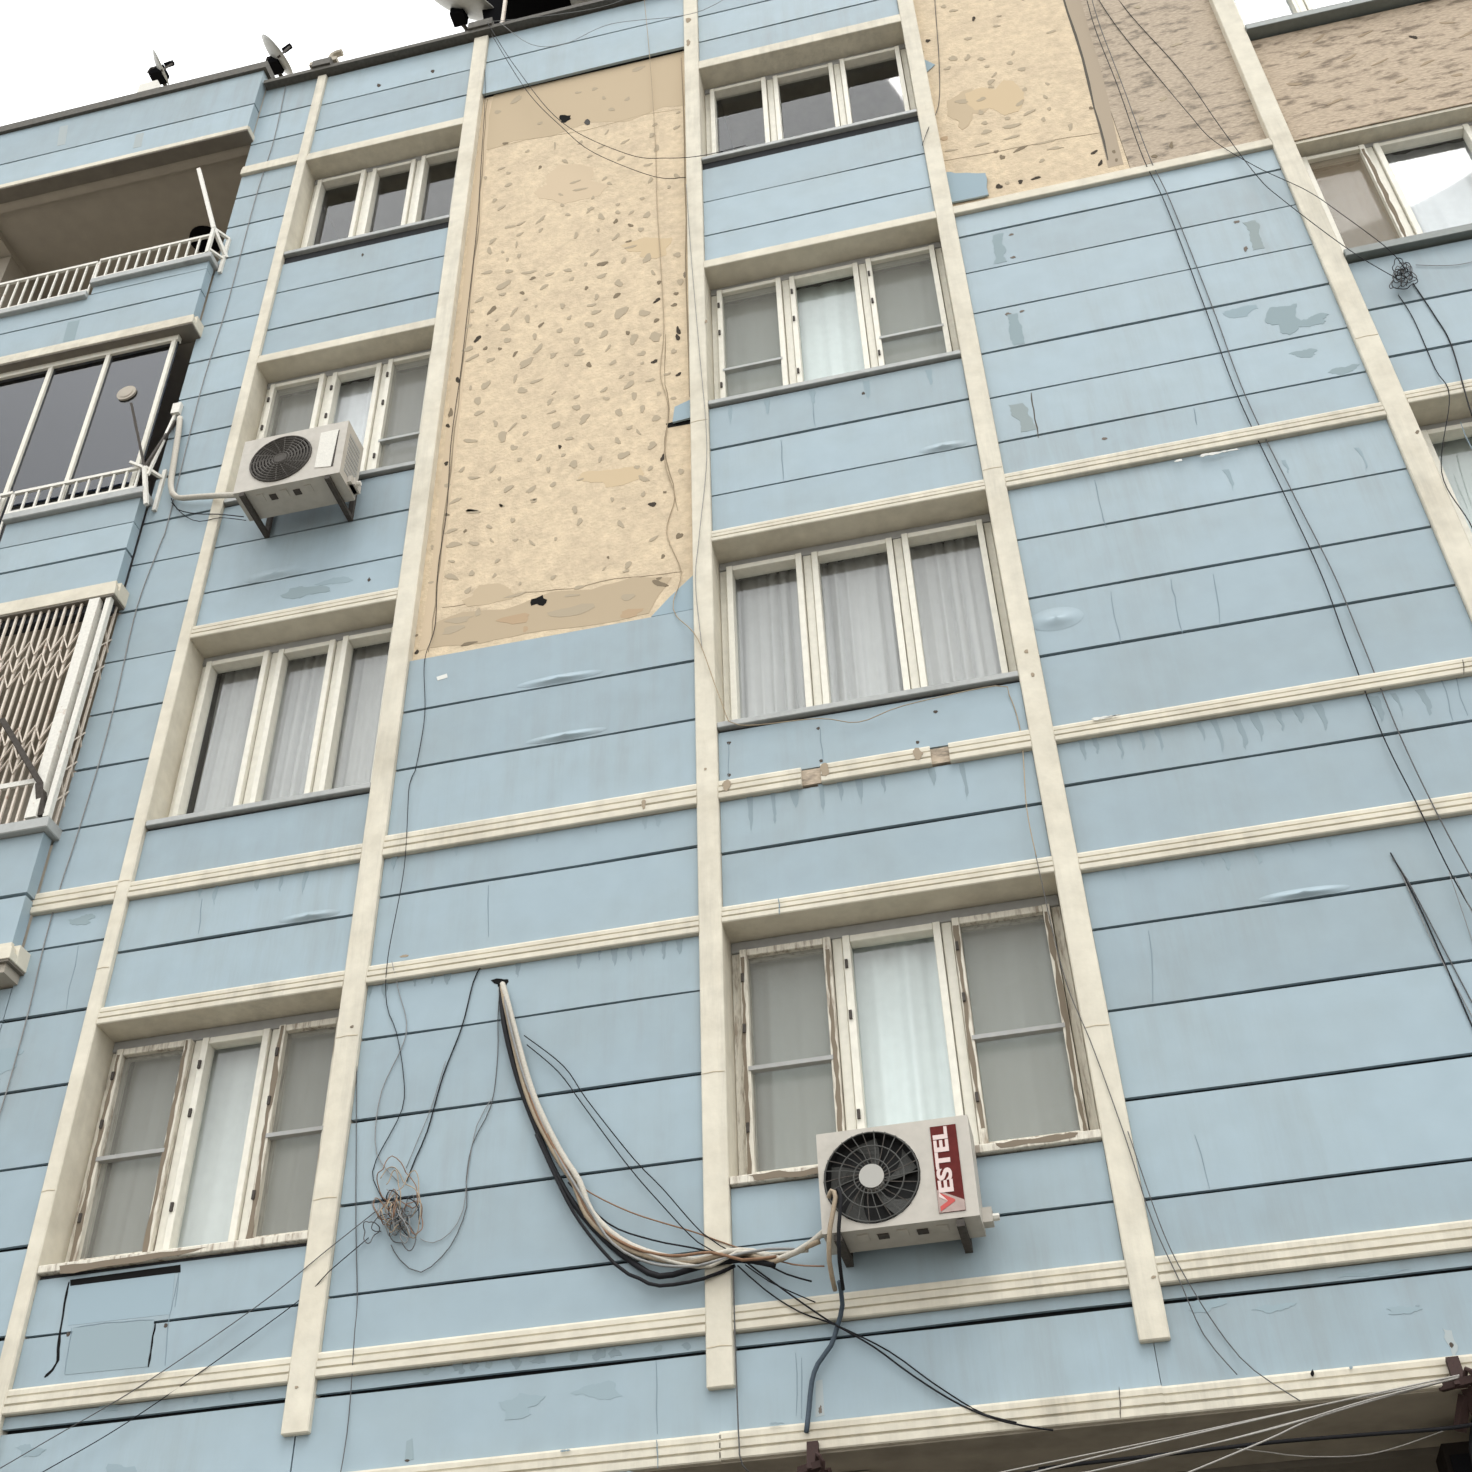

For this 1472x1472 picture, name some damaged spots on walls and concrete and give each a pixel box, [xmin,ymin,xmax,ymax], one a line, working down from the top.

spalling [923,37,1073,163]
peeling [1065,0,1124,168]
peeling [946,172,989,204]
spalling [415,101,693,651]
leakage [1196,704,1328,751]
leakage [746,789,799,829]